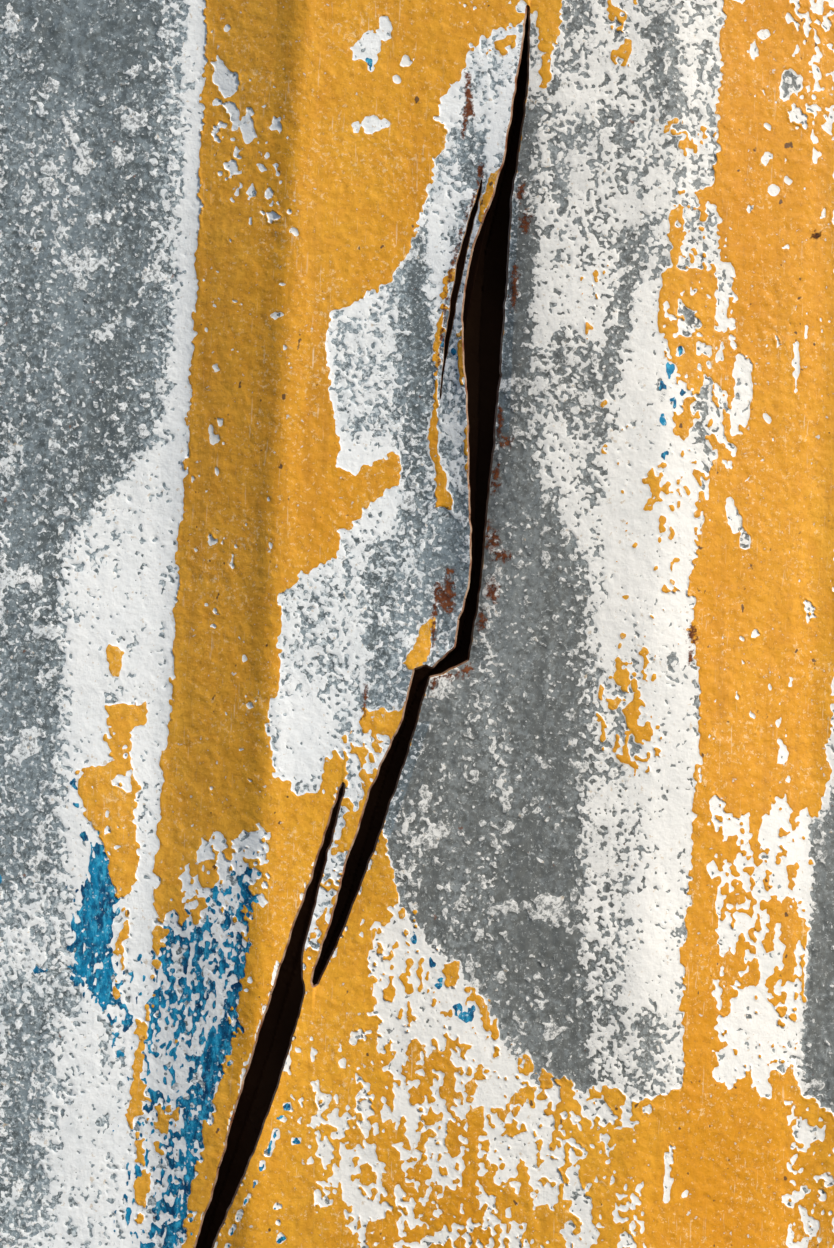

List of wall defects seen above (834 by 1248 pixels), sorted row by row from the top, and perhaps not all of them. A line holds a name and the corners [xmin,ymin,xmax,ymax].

peeling [0,0,289,1248]
crack [440,179,494,399]
peeling [244,0,834,1248]